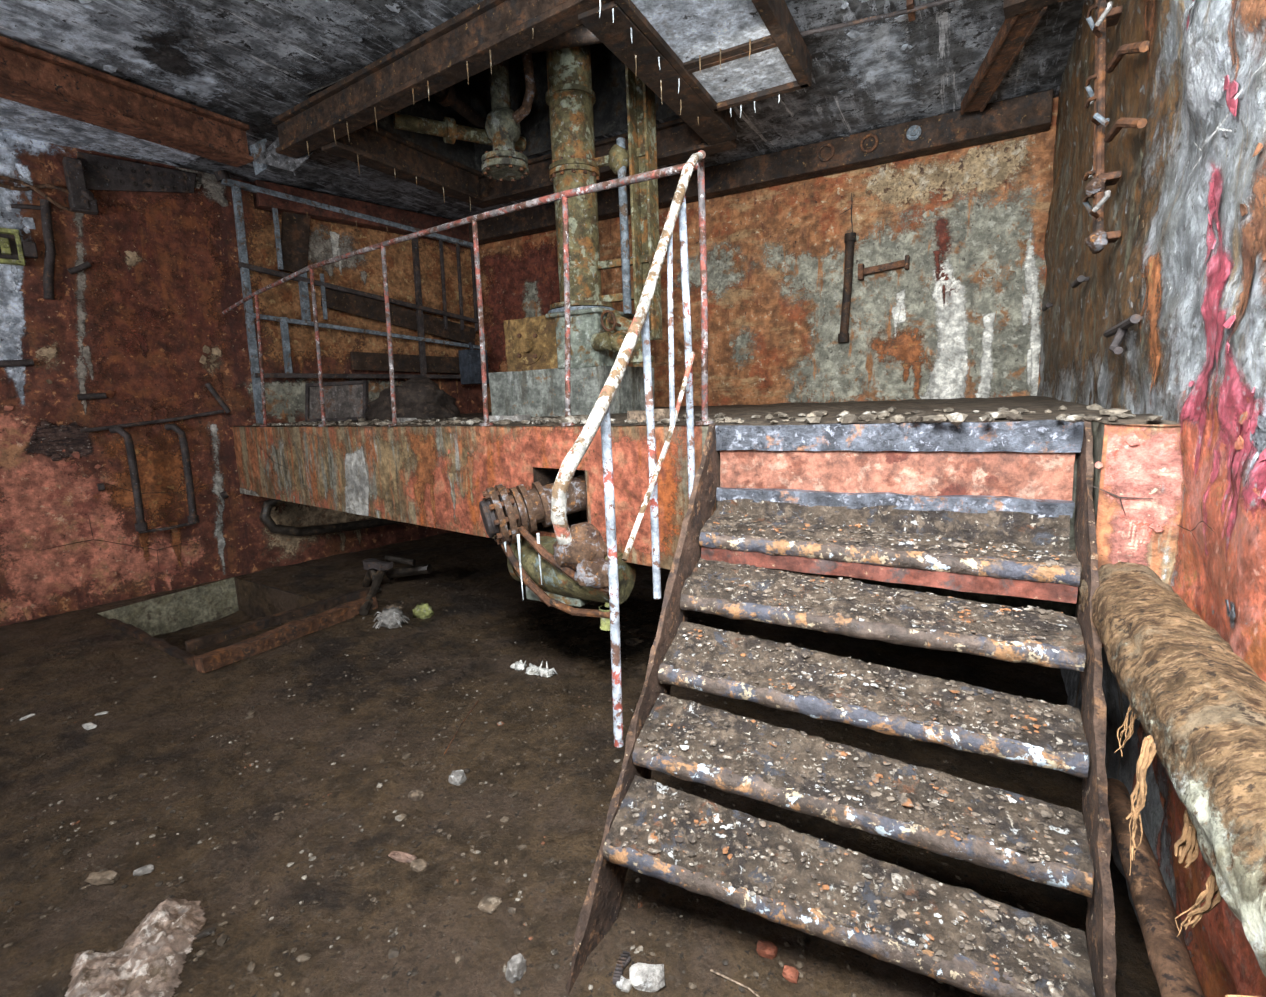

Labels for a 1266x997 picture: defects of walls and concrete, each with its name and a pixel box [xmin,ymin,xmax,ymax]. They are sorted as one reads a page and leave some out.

peeling [1224,75,1238,116]
leakage [0,264,26,404]
corrosion [76,189,234,567]
corrosion [404,427,437,526]
peeling [676,137,1046,403]
leakage [919,258,995,399]
leakage [1020,230,1041,396]
peeling [1095,165,1266,682]
peeling [1137,723,1266,997]